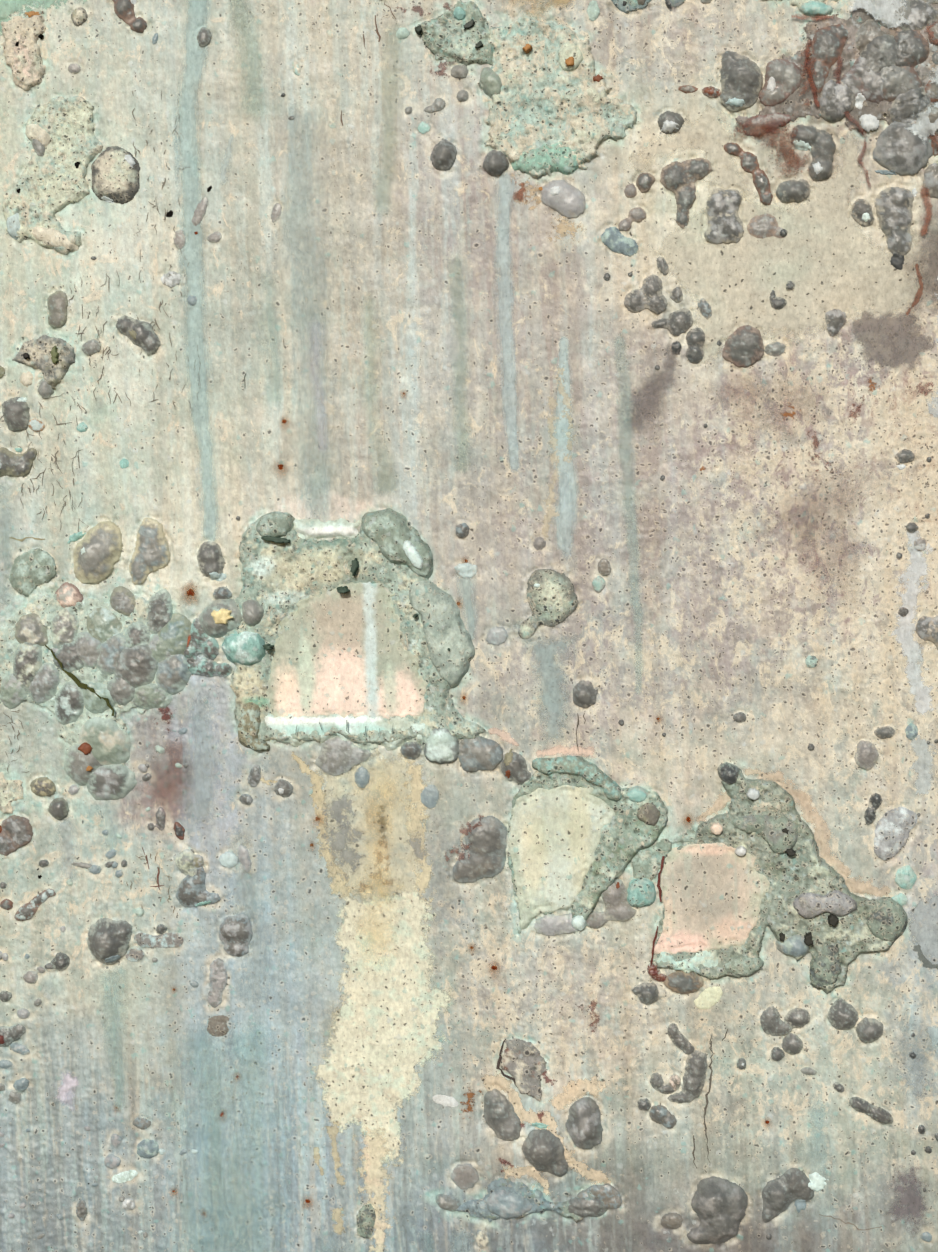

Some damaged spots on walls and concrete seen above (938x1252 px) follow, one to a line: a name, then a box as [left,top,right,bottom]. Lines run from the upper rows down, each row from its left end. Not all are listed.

spalling [0,0,67,91]
peeling [763,0,838,17]
peeling [2,95,103,255]
peeling [199,508,519,751]
peeling [507,746,908,1009]
water stain [292,748,452,1252]
crack [692,1029,728,1168]